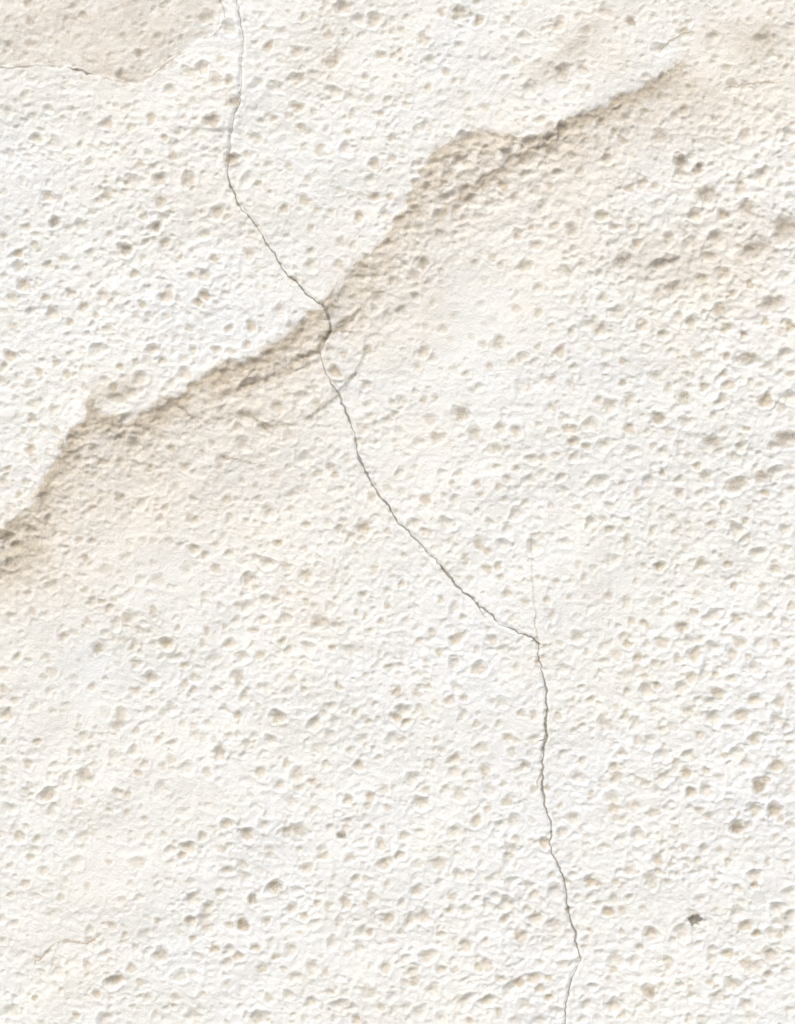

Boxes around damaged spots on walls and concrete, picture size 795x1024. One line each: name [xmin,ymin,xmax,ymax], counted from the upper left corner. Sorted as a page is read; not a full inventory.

flaking render [1,0,139,82]
flaking render [347,63,685,294]
flaking render [0,298,354,564]
crack [227,163,581,1022]